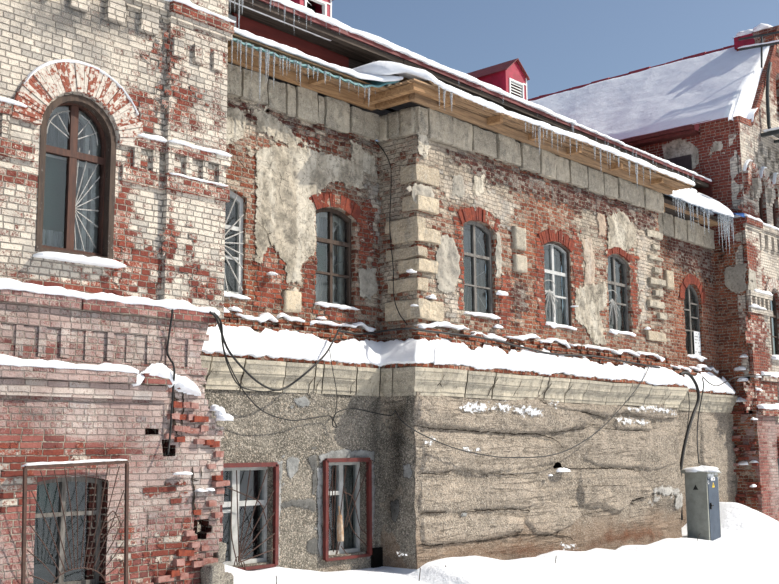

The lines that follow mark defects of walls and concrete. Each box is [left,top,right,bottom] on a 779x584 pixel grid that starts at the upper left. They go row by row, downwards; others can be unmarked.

spalling [138,30,209,136]
flaking render [662,138,725,169]
flaking render [104,97,384,343]
spalling [412,148,722,379]
spalling [743,380,779,413]
spalling [143,481,188,504]
crack [414,412,651,527]
spalling [111,517,205,584]
crack [420,508,574,547]